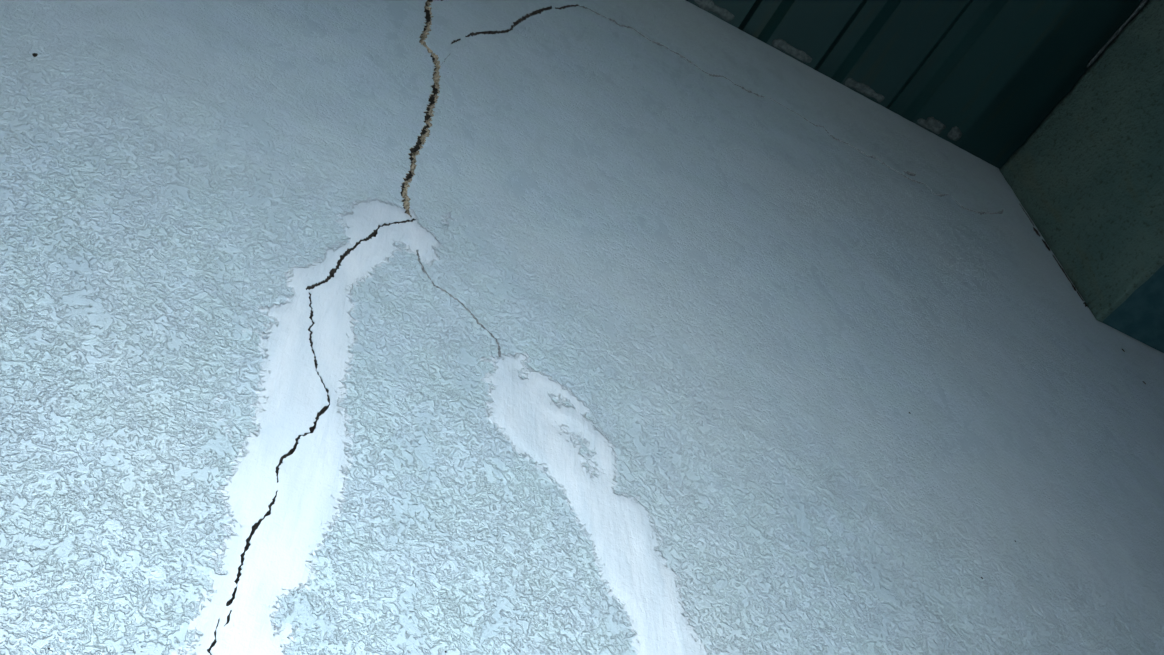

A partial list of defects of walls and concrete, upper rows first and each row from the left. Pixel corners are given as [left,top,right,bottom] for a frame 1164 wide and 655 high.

crack [207,0,1004,655]